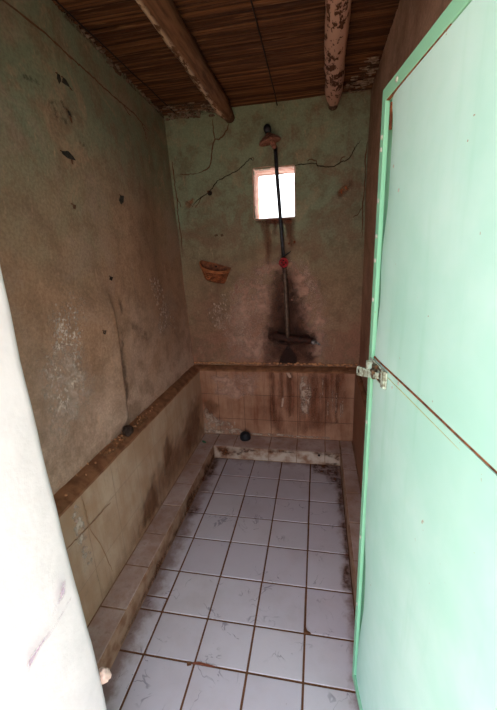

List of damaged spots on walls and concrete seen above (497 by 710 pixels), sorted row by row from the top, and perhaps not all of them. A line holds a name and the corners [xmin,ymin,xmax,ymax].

crack [172,120,254,256]
crack [293,140,368,236]
damp [226,262,326,364]
damp [299,377,311,413]
crack [66,499,113,572]